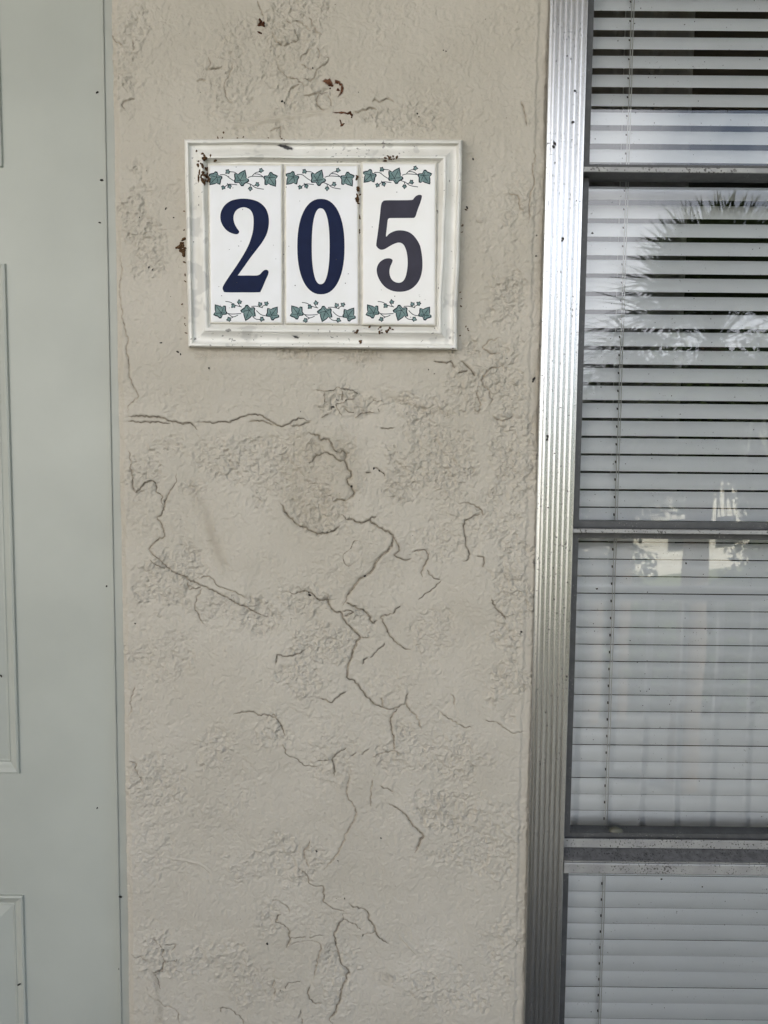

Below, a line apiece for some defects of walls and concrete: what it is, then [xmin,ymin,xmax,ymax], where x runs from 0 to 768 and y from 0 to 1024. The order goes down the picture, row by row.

corrosion [323,78,344,96]
crack [119,265,521,1024]